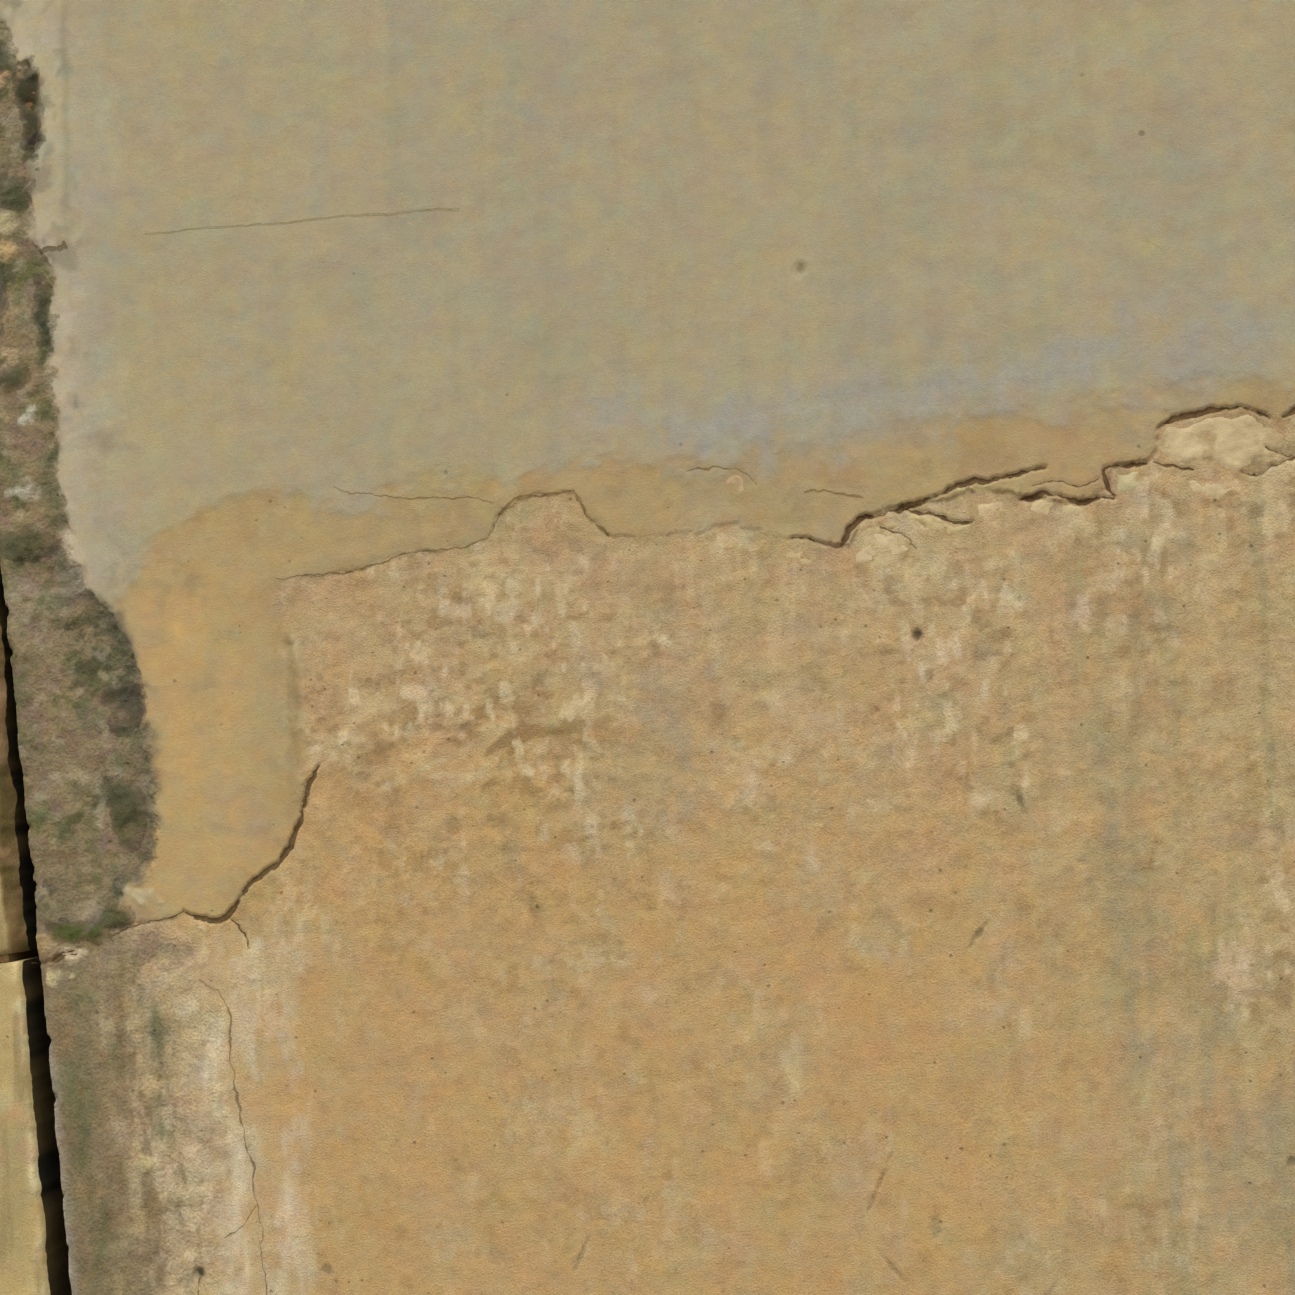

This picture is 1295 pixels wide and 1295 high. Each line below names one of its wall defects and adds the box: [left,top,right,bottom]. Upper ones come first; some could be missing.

flaking render [1159,415,1295,499]
flaking render [1117,472,1145,493]
flaking render [1031,498,1085,515]
flaking render [856,482,1020,563]
spalling [909,625,927,645]
crack [112,765,320,949]
crack [42,948,82,964]